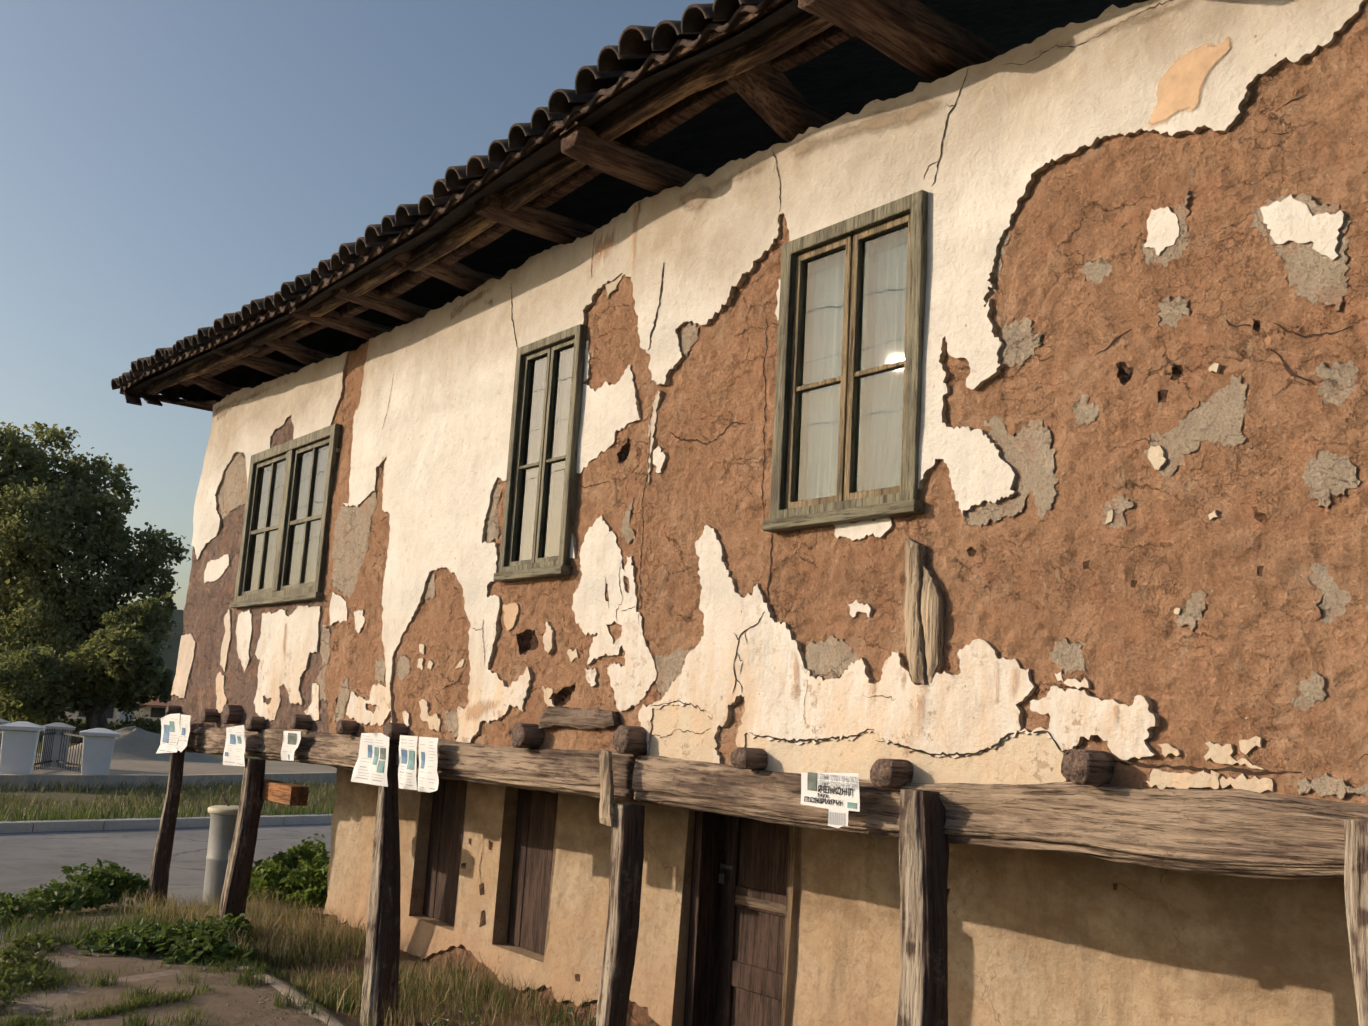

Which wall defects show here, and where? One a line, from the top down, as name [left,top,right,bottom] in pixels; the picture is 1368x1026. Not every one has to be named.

crack [1005,0,1173,65]
crack [924,69,968,185]
crack [648,263,664,349]
flaking render [171,1,1368,805]